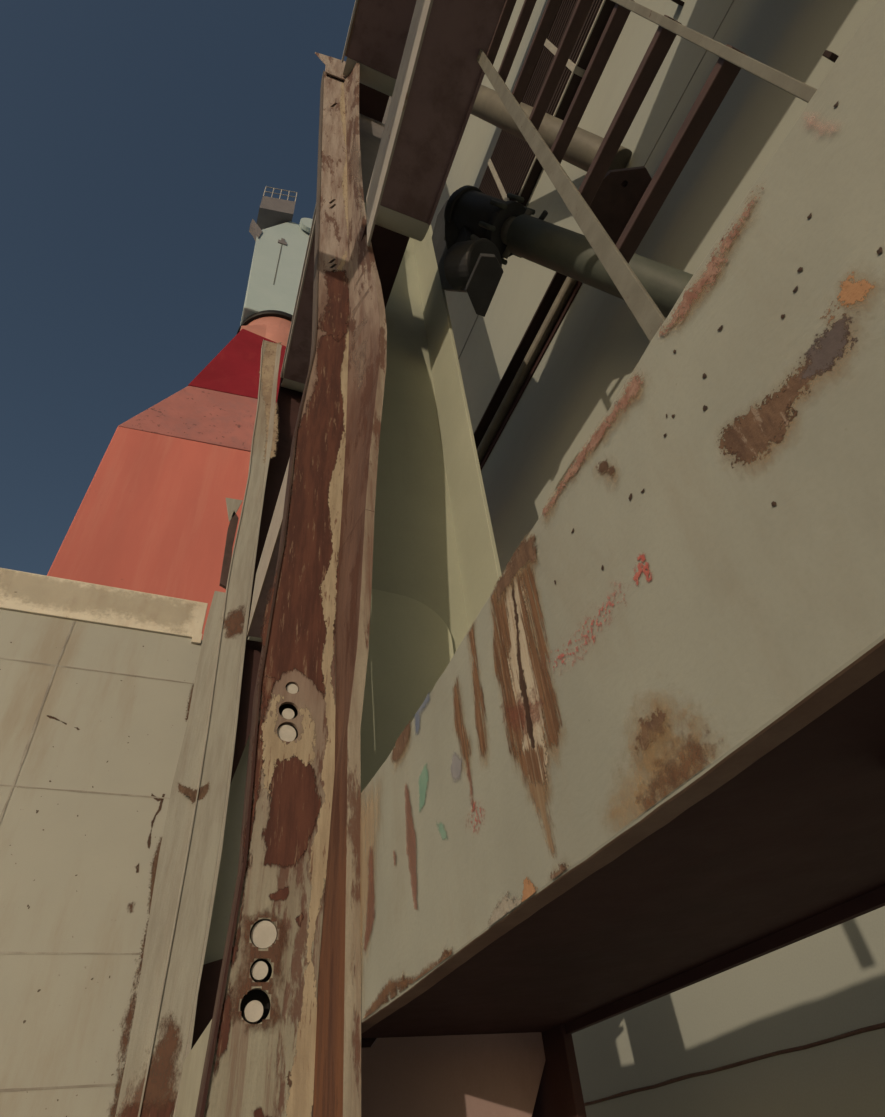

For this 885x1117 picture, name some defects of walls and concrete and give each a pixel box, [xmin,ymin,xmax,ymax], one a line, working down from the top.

rust [223,607,245,639]
rust [178,783,210,803]
rust [393,785,417,909]
rust [452,624,487,811]
rust [490,563,567,879]
rust [611,703,708,823]
rust [110,837,162,1117]